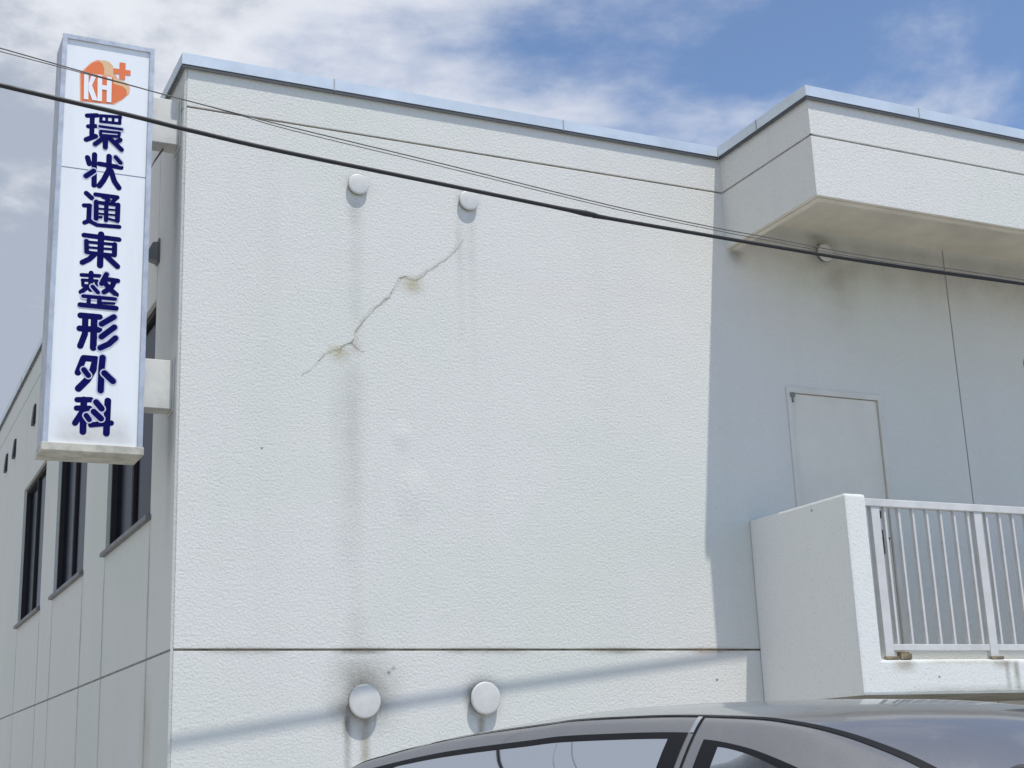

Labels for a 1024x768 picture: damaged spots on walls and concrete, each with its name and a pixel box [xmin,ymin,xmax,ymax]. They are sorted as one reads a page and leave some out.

crack [302,239,464,375]